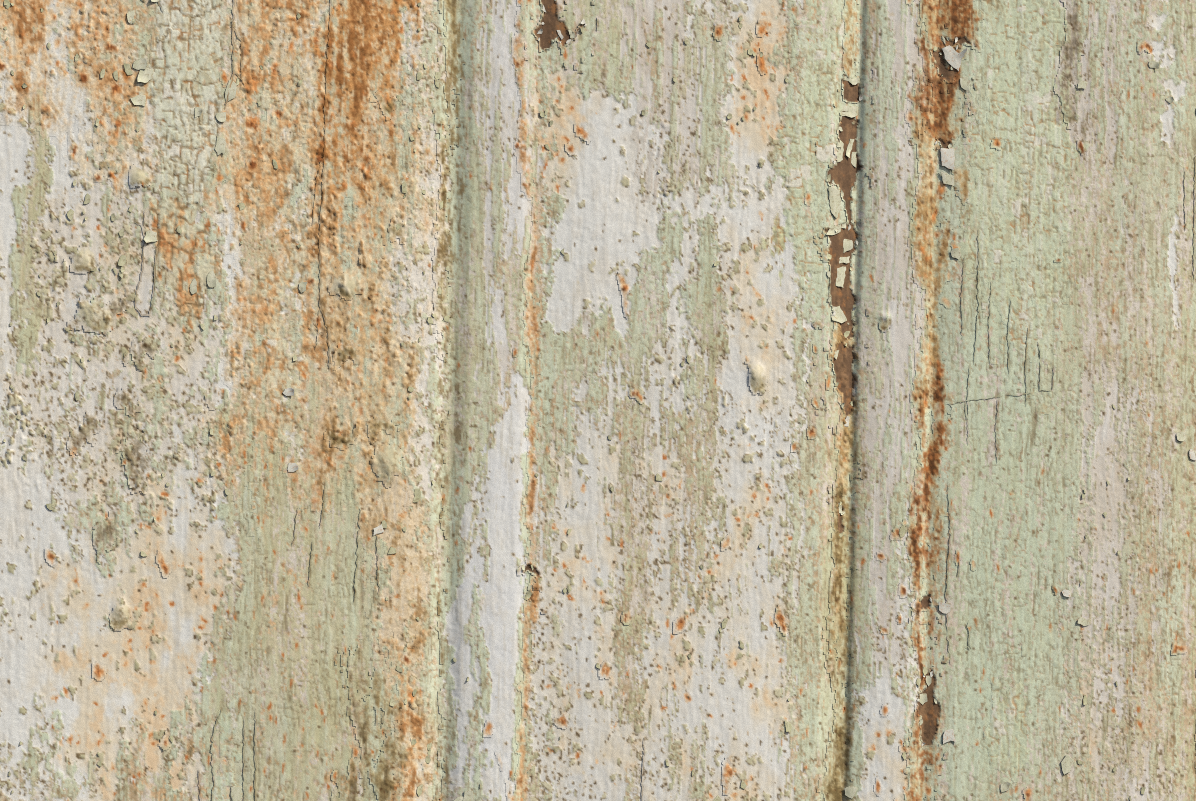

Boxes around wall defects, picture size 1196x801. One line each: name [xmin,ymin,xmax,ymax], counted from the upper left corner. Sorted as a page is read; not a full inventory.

crack [124,0,332,369]
peeling [0,70,247,801]
corrosion [0,0,454,801]
crack [272,388,303,472]
crack [292,485,327,587]
crack [354,507,381,602]
peeling [354,520,419,651]
peeling [390,0,969,801]
corrosion [874,0,985,801]